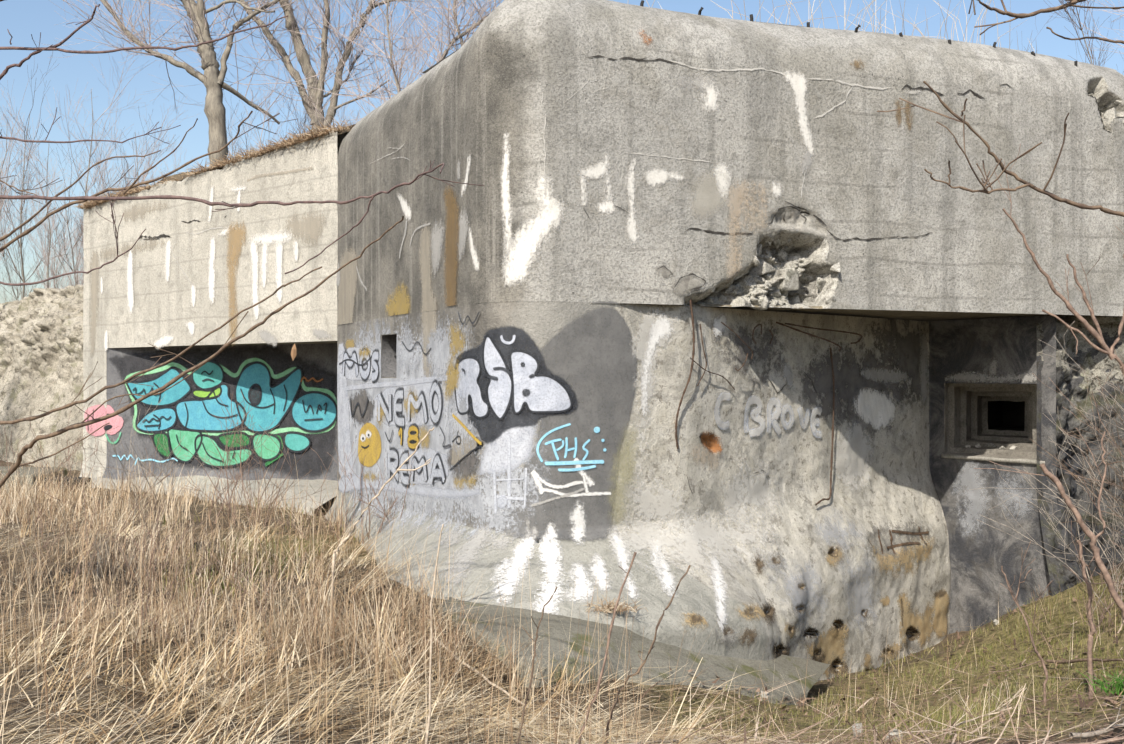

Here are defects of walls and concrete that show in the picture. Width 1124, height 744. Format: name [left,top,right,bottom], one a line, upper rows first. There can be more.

crack [541,55,1013,174]
spalling [1087,76,1124,133]
crack [686,227,754,235]
crack [827,230,932,241]
damp [191,226,234,307]
spalling [656,201,909,505]
rust [701,432,722,454]
spalling [825,545,844,566]
spalling [868,522,934,576]
spalling [685,580,870,677]
spalling [866,627,920,671]